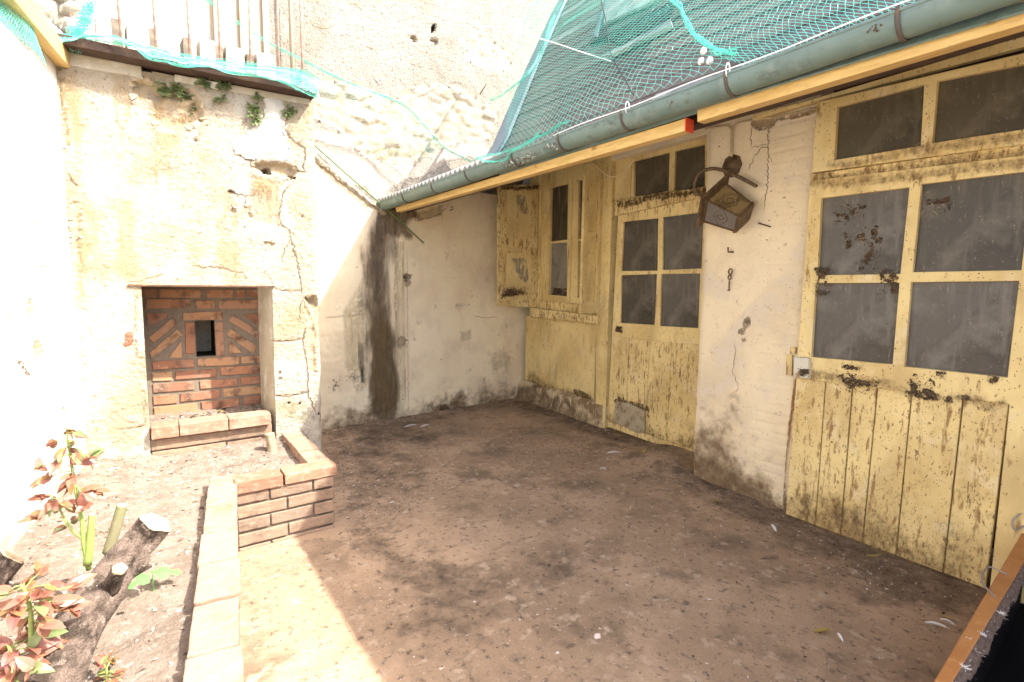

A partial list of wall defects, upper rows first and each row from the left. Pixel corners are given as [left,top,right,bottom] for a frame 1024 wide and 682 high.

crack [749,125,773,207]
crack [194,126,362,417]
damp [333,208,424,456]
peeling [738,316,751,342]
damp [423,394,466,413]
damp [676,430,774,520]